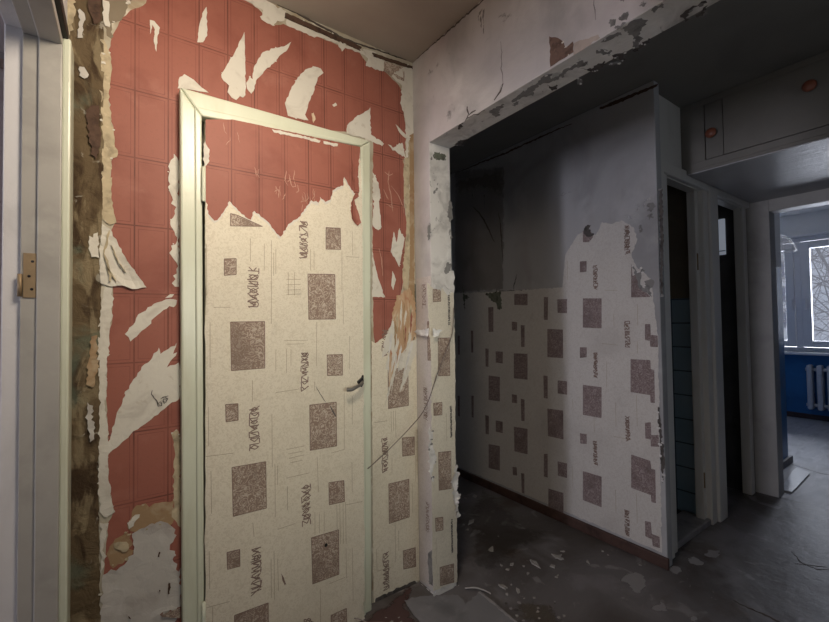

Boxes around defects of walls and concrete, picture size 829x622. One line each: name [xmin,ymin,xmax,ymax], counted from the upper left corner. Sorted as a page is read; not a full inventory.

peeling [245,0,384,71]
spalling [489,12,650,118]
spalling [680,0,708,22]
spalling [639,188,664,297]
peeling [67,0,146,622]